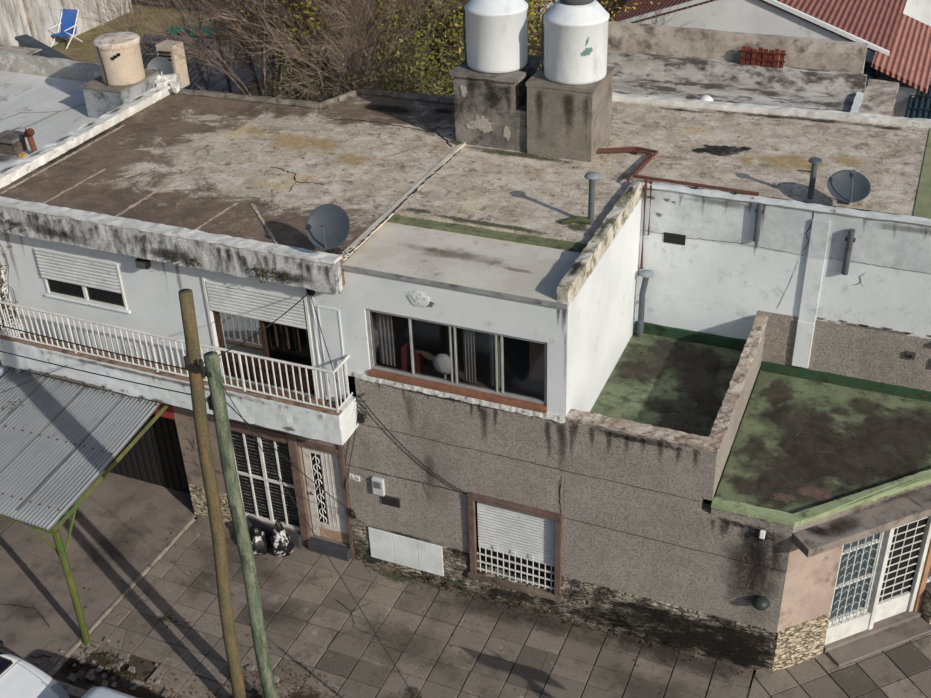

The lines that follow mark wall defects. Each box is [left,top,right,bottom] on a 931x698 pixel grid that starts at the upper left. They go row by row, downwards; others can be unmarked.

damp [466,114,511,140]
crack [271,167,324,192]
crack [329,118,461,252]
damp [27,215,80,241]
damp [135,235,187,262]
damp [264,257,330,283]
damp [617,339,736,435]
damp [409,390,497,424]
damp [591,430,681,456]
damp [733,380,931,507]
damp [713,520,781,596]
damp [574,603,774,674]